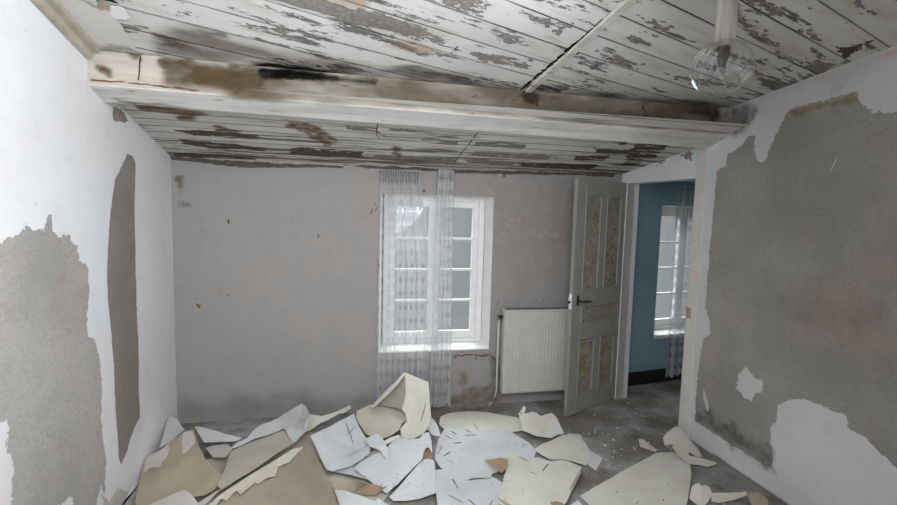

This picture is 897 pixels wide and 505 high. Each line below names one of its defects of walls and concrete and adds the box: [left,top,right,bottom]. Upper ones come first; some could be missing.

peeling [275,0,444,47]
peeling [439,0,491,18]
peeling [515,9,574,36]
peeling [470,51,534,69]
crack [520,13,610,117]
peeling [805,40,874,72]
water stain [161,62,719,128]
peeling [174,130,266,160]
peeling [289,141,669,177]
peeling [694,91,897,468]
peeling [107,154,140,464]
peeling [0,214,107,505]